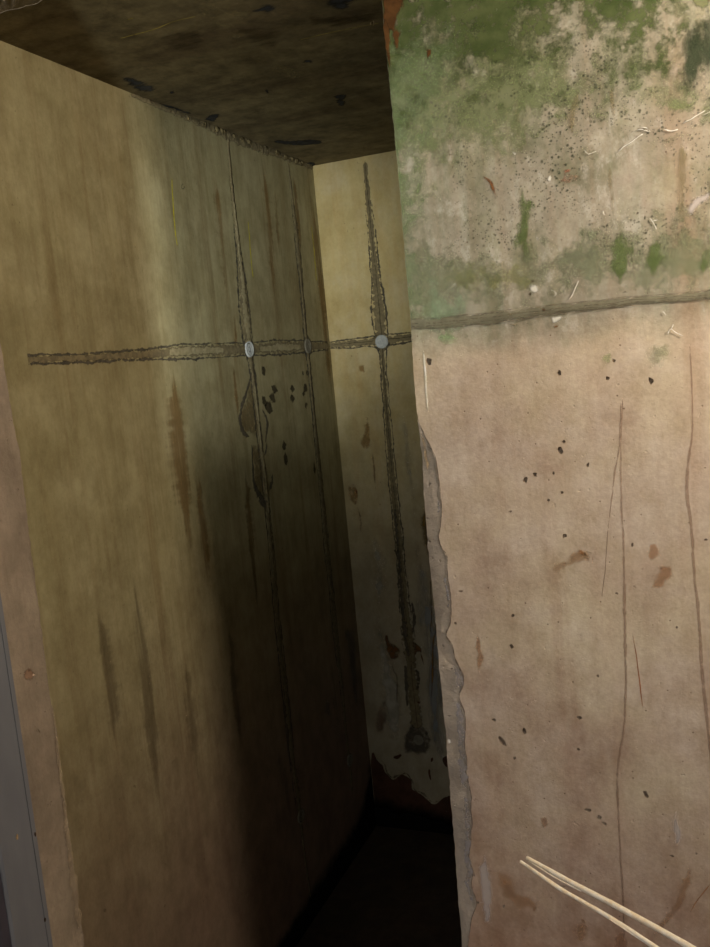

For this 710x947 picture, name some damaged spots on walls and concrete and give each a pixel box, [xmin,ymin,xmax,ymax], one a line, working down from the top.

corrosion [383,0,403,66]
damp [509,41,648,214]
damp [603,187,709,252]
spalling [371,422,479,947]